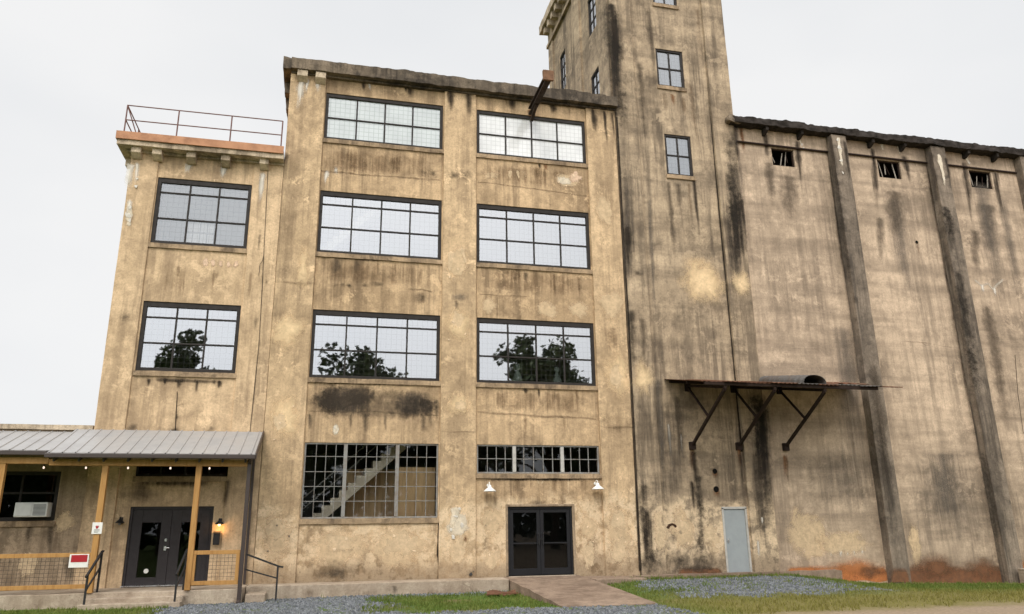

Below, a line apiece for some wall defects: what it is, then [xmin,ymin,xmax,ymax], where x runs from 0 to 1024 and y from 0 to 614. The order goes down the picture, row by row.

water stain [728,168,746,261]
water stain [927,167,977,386]
water stain [317,383,437,423]
water stain [754,399,769,529]
peeling [447,507,474,576]